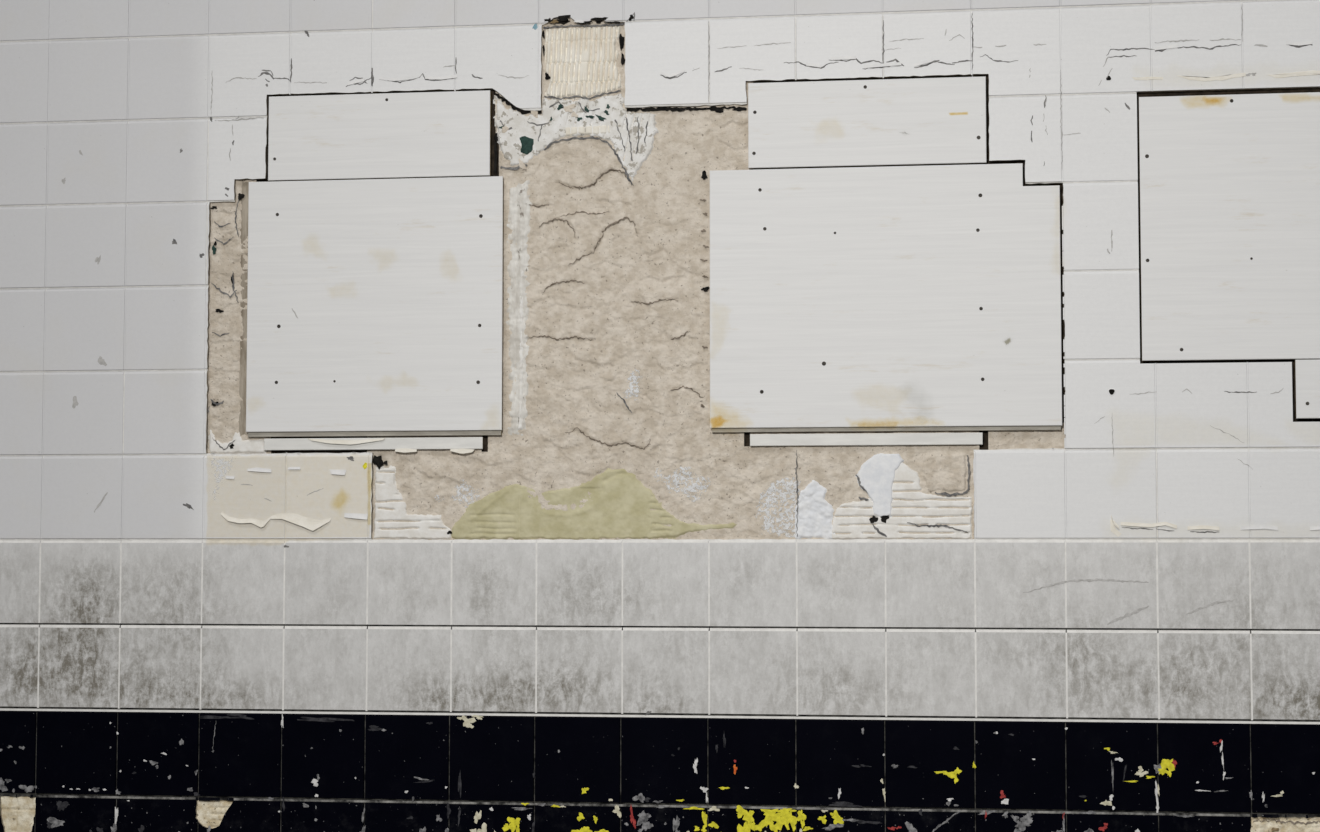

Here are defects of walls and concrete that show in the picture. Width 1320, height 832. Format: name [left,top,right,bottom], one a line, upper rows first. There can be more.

crack [660,14,1078,165]
crack [1098,7,1312,113]
spalling [199,14,1065,540]
spalling [0,778,129,832]
spalling [186,765,233,832]
peeling [405,771,462,832]
peeling [512,803,546,832]
peeling [624,793,680,832]
peeling [822,788,880,830]
peeling [978,811,1033,832]
peeling [1056,757,1127,832]
spalling [1249,790,1320,832]